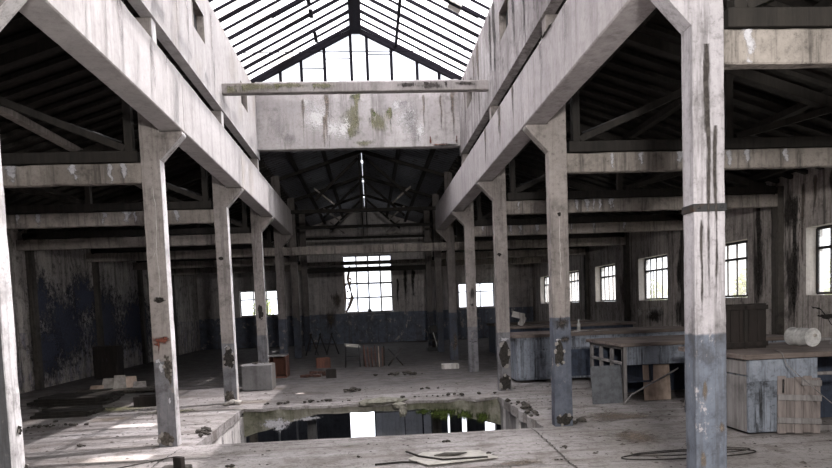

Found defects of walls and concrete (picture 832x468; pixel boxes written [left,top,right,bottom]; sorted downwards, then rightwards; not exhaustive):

damp [302,94,359,144]
damp [389,82,428,141]
damp [439,81,466,126]
damp [791,175,817,304]
spalling [156,355,173,384]
spalling [499,338,511,391]
spalling [554,339,565,367]
spalling [157,432,174,446]
spalling [556,413,573,427]